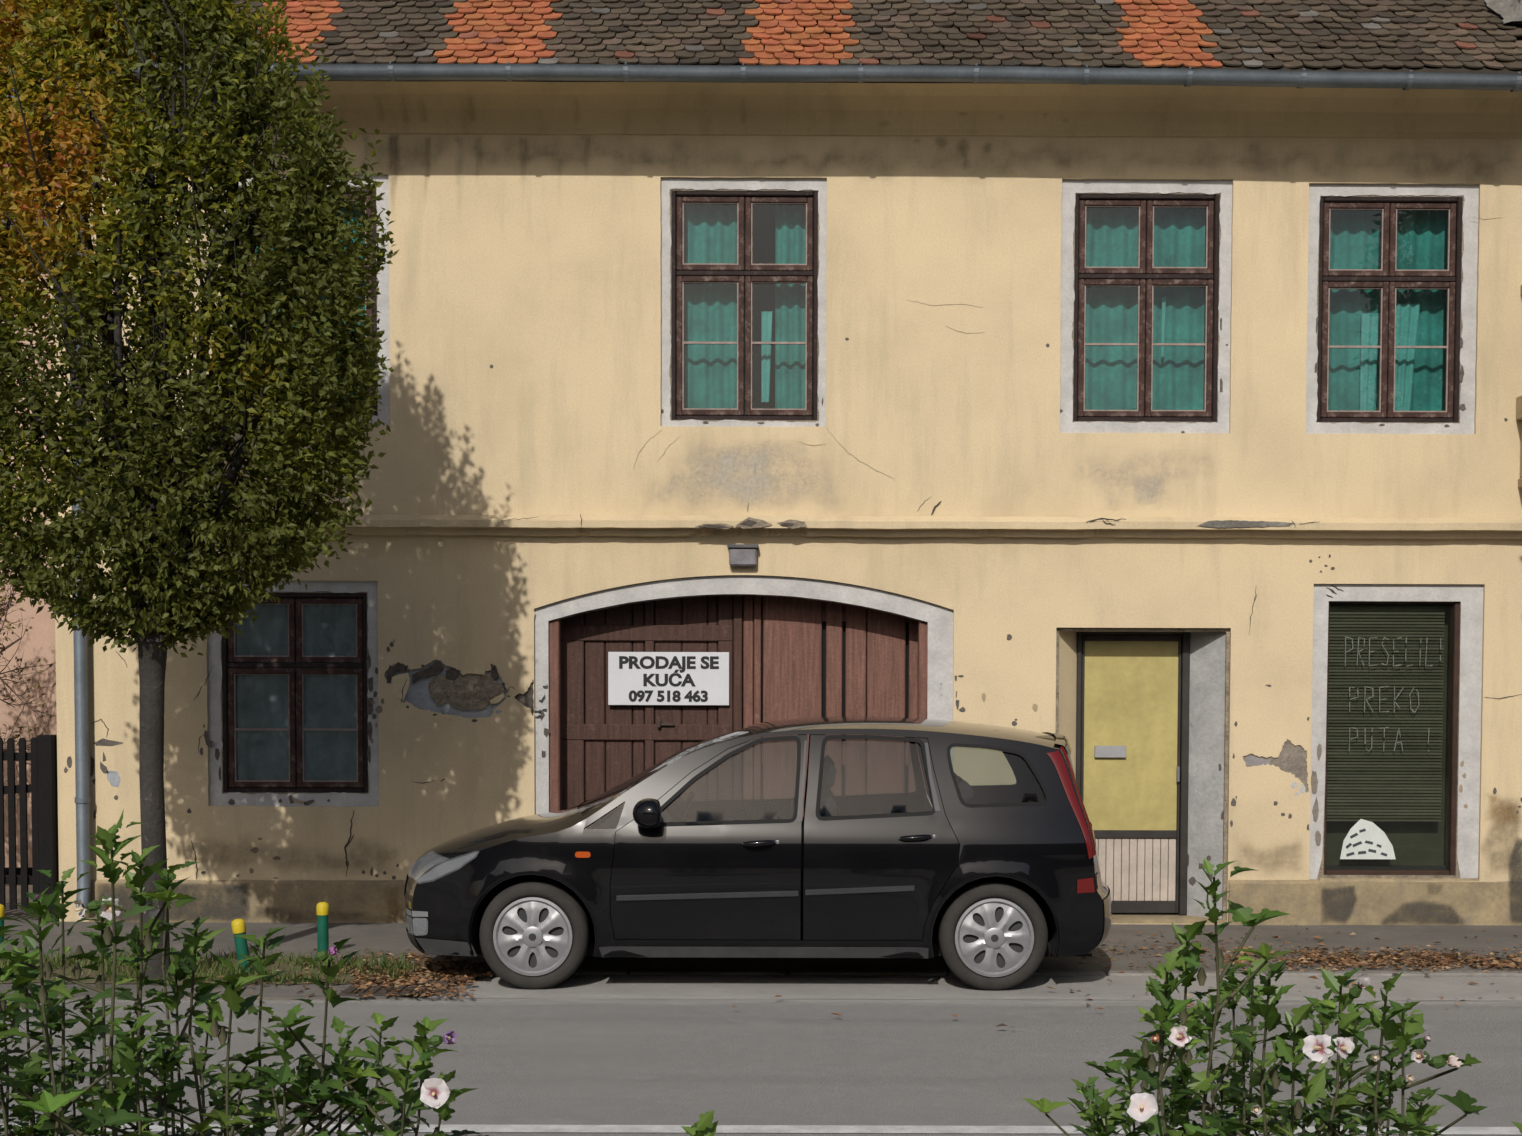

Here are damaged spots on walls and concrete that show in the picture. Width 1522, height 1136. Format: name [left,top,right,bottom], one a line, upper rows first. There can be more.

spalling [366,640,550,774]
crack [344,811,354,875]
peeling [1187,855,1213,886]
peeling [1219,739,1322,846]